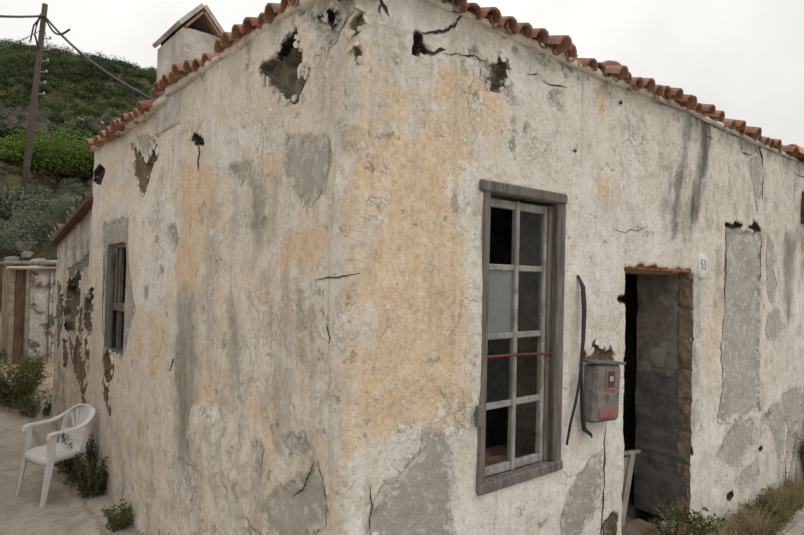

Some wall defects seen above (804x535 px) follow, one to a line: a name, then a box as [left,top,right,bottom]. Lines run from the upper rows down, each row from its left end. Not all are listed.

spalling [259,0,368,106]
crack [412,15,487,62]
spalling [473,51,518,105]
spalling [131,134,159,196]
peeling [282,131,331,208]
water stain [691,122,710,227]
peeling [33,216,136,417]
peeling [241,430,328,535]
peeling [365,427,457,535]
peeling [560,450,604,535]
crack [601,421,618,535]